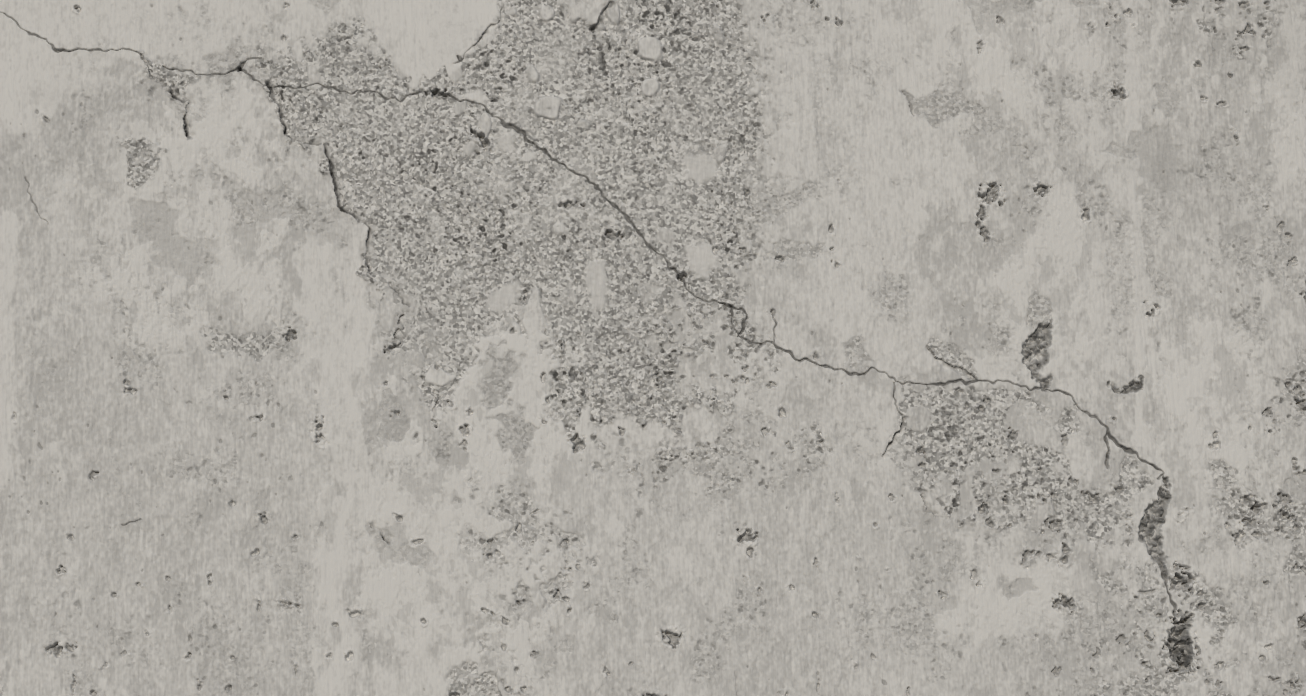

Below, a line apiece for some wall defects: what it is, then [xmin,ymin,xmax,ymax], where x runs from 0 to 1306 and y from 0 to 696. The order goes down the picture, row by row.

spalling [255,0,840,513]
crack [0,11,1168,489]
peeling [1027,290,1054,328]
spalling [876,337,1239,696]
crack [1164,565,1177,619]
spalling [1248,347,1306,437]